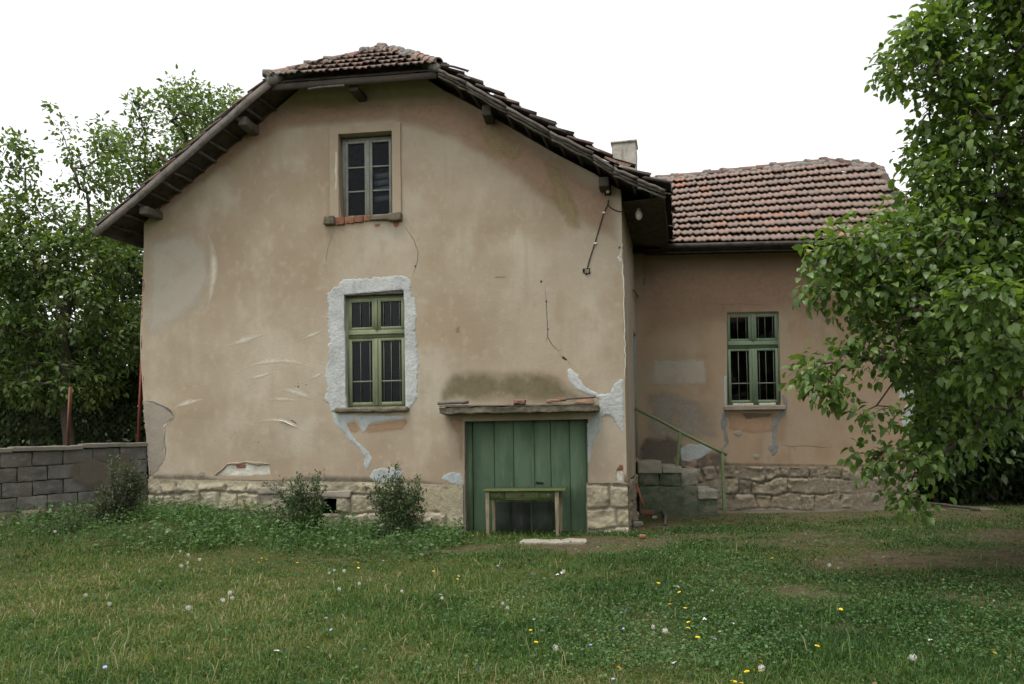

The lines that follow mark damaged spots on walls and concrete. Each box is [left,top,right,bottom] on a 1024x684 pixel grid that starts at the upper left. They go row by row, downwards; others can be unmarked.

crack [540,280,570,364]
flaking render [199,461,271,477]